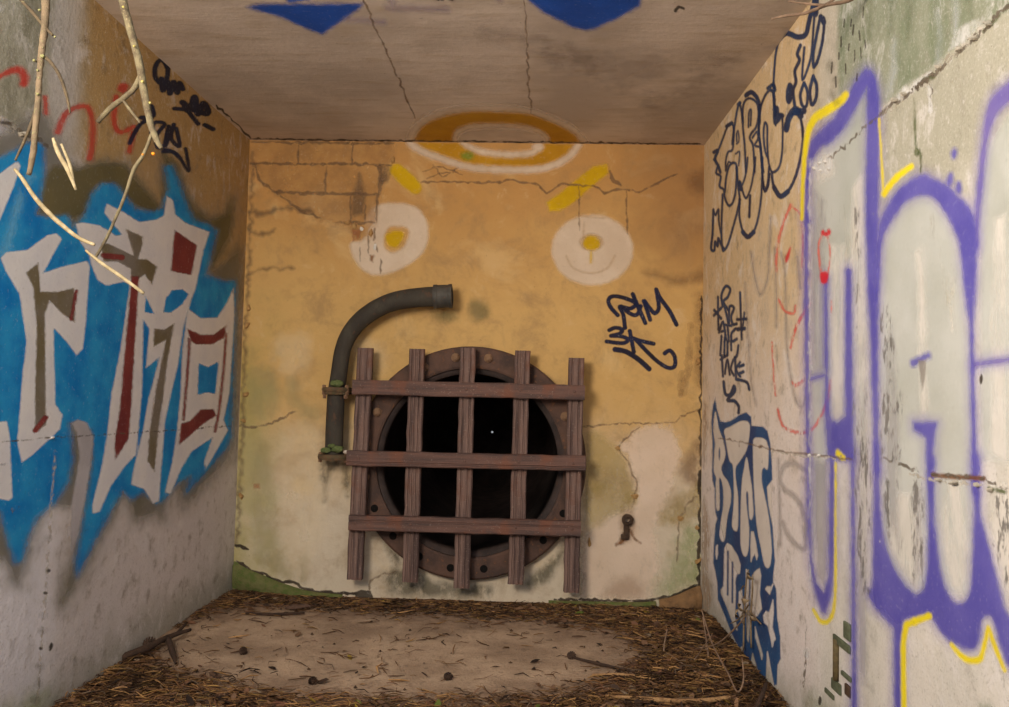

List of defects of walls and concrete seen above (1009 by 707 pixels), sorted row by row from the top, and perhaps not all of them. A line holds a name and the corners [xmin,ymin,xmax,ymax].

crack [0,116,49,148]
crack [828,4,1009,159]
crack [199,0,701,596]
peeling [580,425,681,600]
crack [883,457,1007,494]